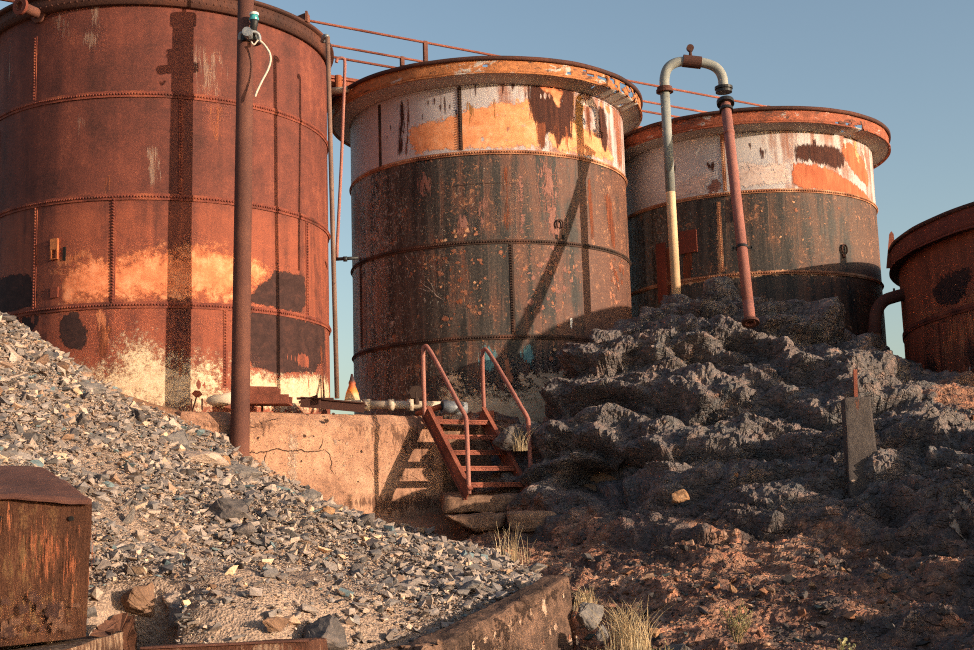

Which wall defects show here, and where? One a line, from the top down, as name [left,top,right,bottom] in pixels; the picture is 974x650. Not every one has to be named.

peeling [540,86,563,107]
peeling [409,98,614,163]
corrosion [525,85,621,240]
peeling [675,172,722,199]
peeling [738,162,789,188]
corrosion [792,142,870,200]
corrosion [51,243,233,362]
corrosion [251,259,268,290]
damp [91,329,227,432]
damp [250,370,329,413]
crack [249,418,347,472]
corrosion [0,505,76,605]